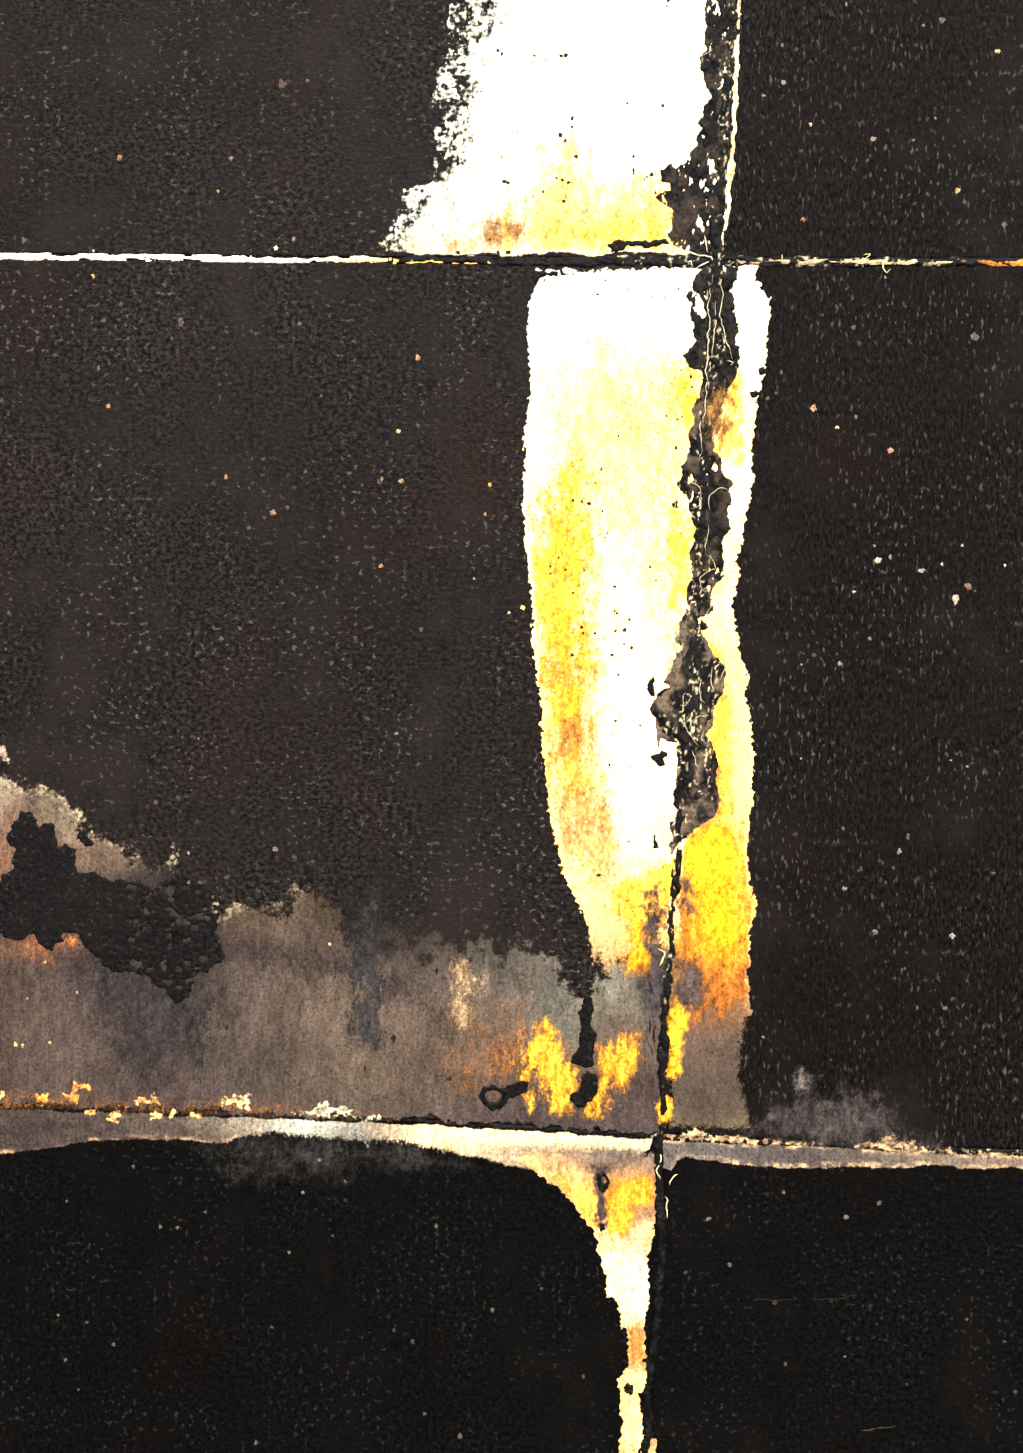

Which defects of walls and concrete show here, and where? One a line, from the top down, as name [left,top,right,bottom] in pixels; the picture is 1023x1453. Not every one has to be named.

peeling [379,0,738,257]
rust [445,131,674,253]
rust [527,333,752,1077]
crack [682,662,726,771]
peeling [0,264,778,1453]
damp [73,885,453,1077]
crack [648,910,679,1053]
damp [292,1101,382,1120]
rust [462,1017,639,1116]
rust [656,1096,672,1124]
crack [656,1155,678,1218]
peeling [663,1140,1023,1170]